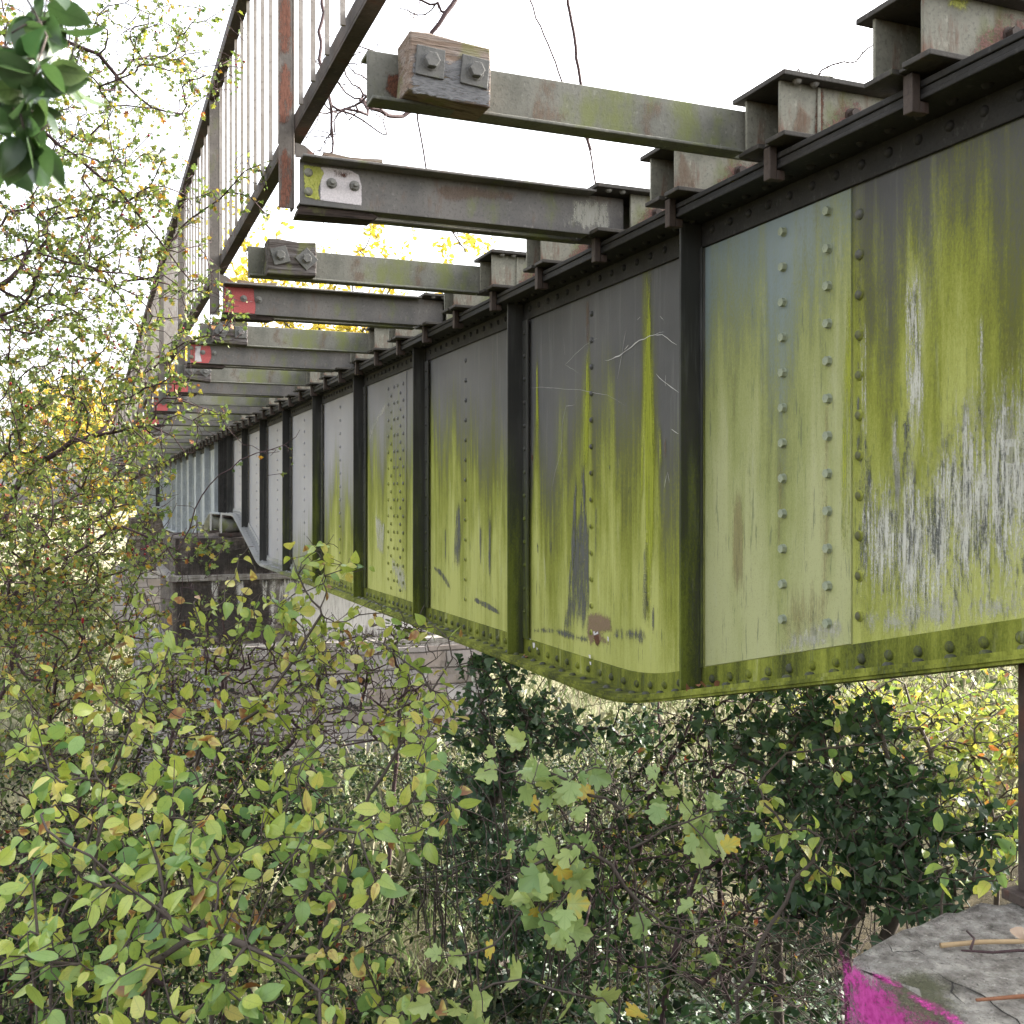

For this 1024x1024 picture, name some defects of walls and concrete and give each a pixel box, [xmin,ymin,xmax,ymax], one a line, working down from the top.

damp [902,409,910,481]
damp [928,463,956,563]